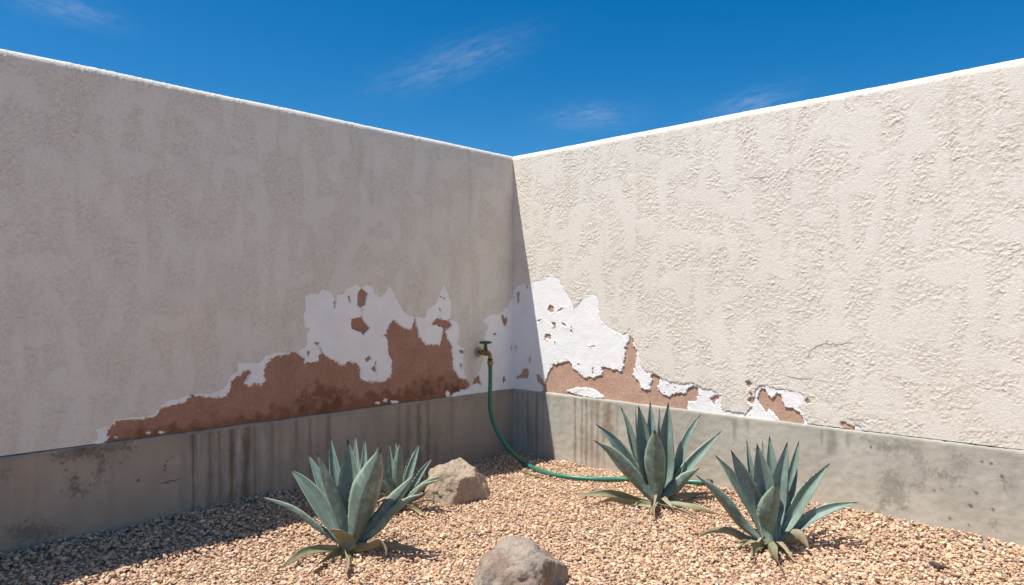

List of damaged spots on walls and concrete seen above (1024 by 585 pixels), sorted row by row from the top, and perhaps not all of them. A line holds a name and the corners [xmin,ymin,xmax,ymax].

peeling [89,274,814,445]
crack [787,340,852,379]